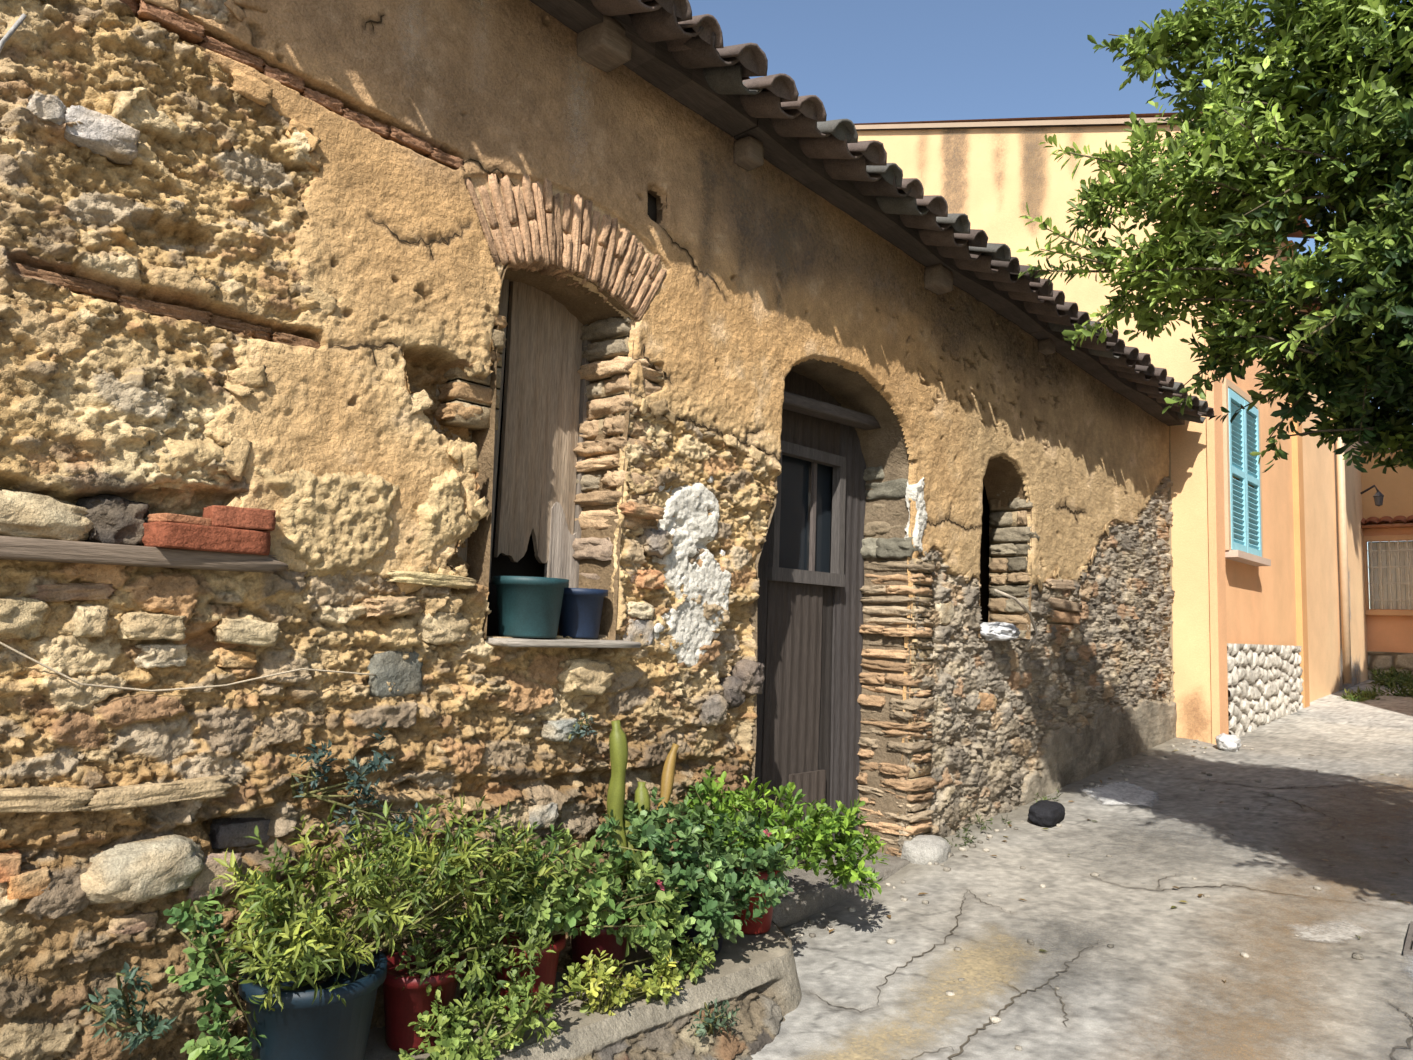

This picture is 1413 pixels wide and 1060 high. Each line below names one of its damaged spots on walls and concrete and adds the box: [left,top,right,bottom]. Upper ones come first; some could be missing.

water stain [944,129,966,213]
water stain [1023,129,1045,220]
flaking render [0,0,465,520]
crack [373,220,470,257]
crack [663,228,727,301]
flaking render [898,476,1175,857]
crack [813,890,1011,1012]
crack [902,941,1098,1060]
crack [1389,1002,1413,1060]